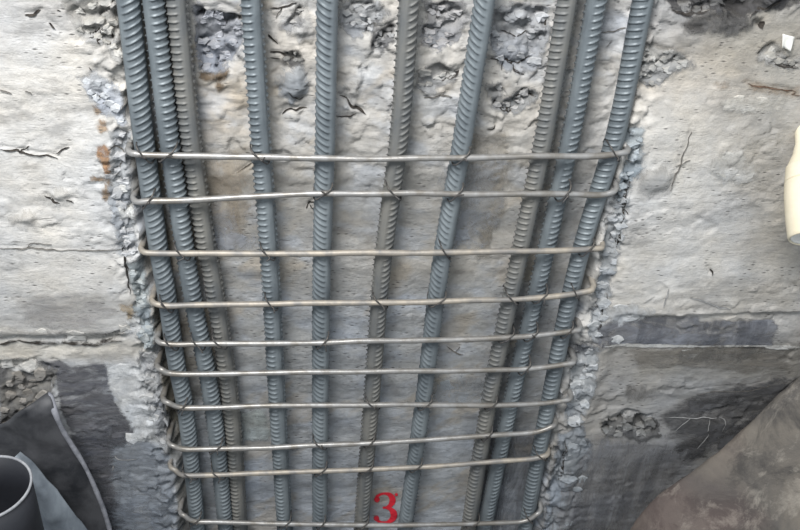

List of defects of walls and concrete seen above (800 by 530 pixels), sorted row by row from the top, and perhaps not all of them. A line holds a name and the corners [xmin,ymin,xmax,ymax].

spalling [62,0,123,65]
spalling [191,1,244,74]
spalling [414,0,471,95]
spalling [490,2,551,73]
crack [282,93,307,114]
crack [338,95,365,117]
crack [0,146,69,159]
rust [91,145,112,200]
crack [670,132,692,191]
spalling [0,71,173,454]
spalling [542,127,708,530]
leakage [552,316,790,530]